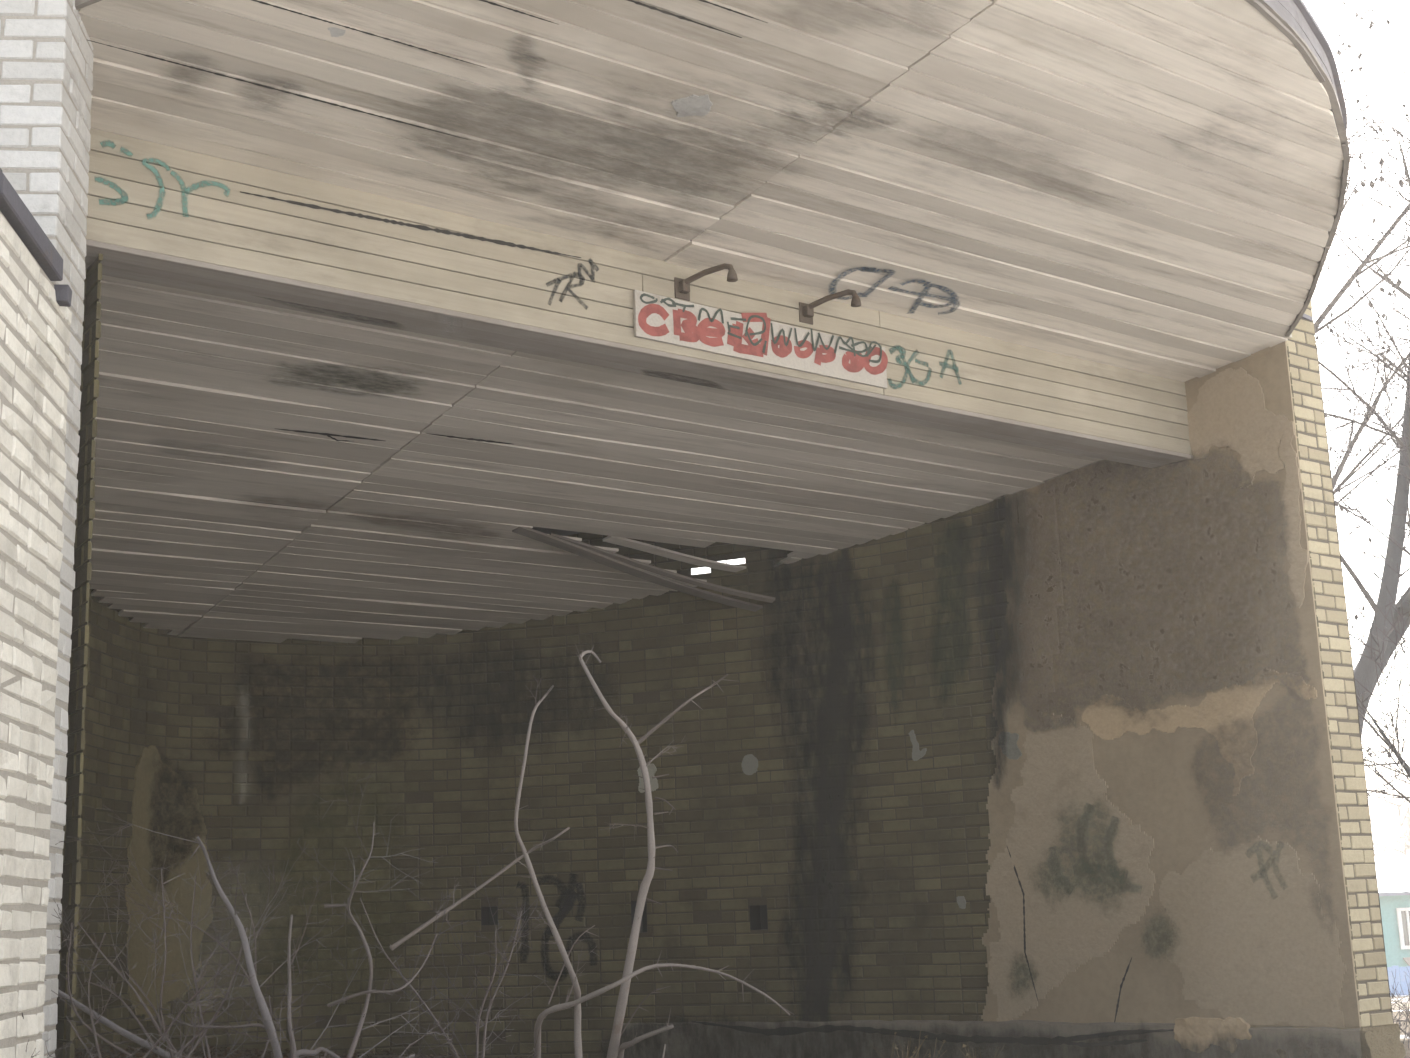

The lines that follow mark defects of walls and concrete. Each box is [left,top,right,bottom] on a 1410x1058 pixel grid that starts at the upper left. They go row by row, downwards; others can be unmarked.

leakage [278,366,410,392]
peeling [1187,367,1309,608]
leakage [211,658,412,797]
leakage [425,648,601,743]
leakage [150,761,202,884]
leakage [604,548,1357,1058]
peeling [985,671,1347,1028]
crack [1007,847,1038,1000]
crack [691,958,1174,1047]
flaking render [1361,1030,1406,1058]